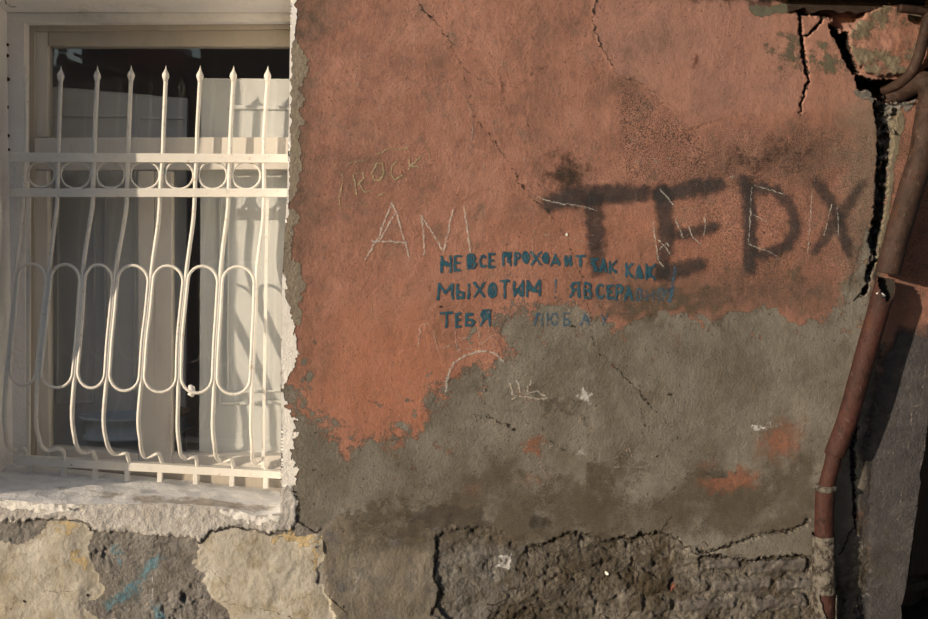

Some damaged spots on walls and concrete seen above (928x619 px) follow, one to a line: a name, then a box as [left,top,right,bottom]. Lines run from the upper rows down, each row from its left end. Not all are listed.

crack [417,0,571,250]
crack [796,13,859,133]
crack [853,100,918,301]
peeling [871,98,916,280]
peeling [0,227,874,619]
crack [579,271,660,423]
peeling [834,326,928,619]